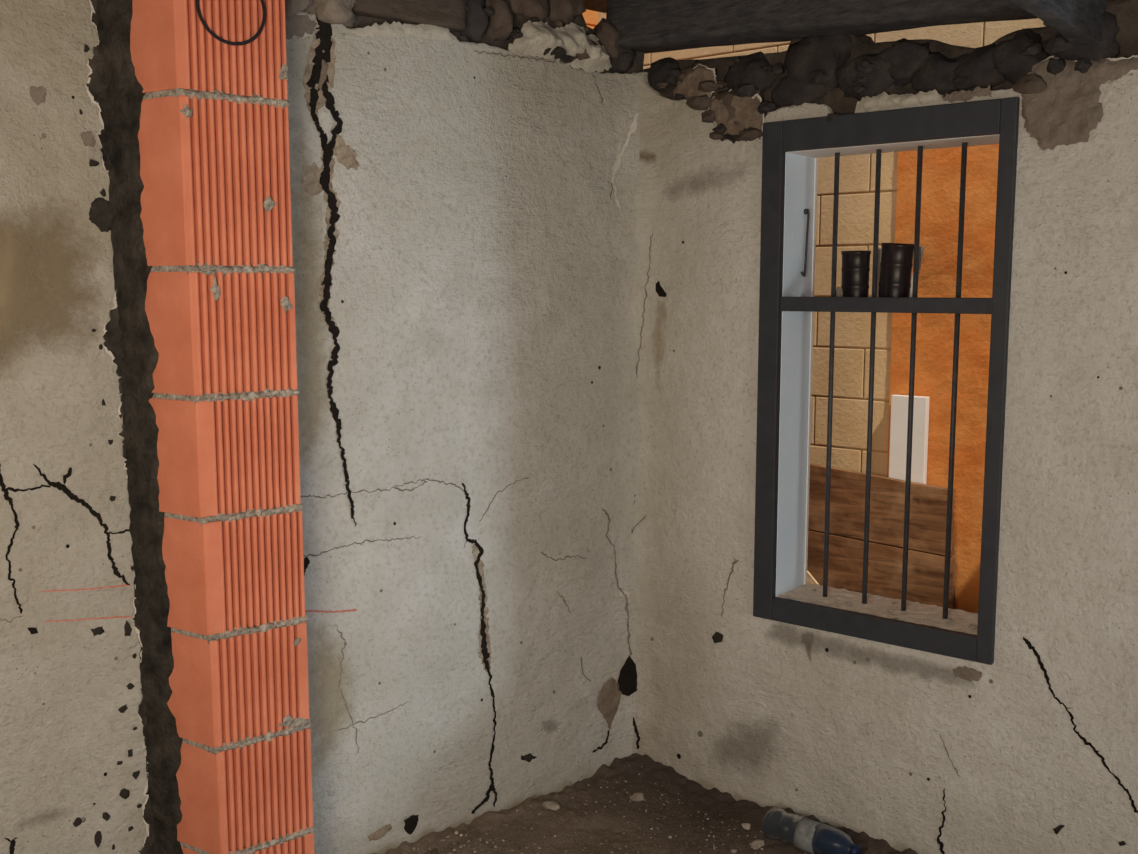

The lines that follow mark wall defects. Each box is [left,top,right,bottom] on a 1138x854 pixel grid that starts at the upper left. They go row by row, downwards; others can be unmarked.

flaking render [72,0,111,171]
flaking render [543,27,598,64]
flaking render [657,64,776,144]
flaking render [1012,55,1138,151]
leakage [0,224,88,359]
flaking render [91,292,128,479]
crack [300,13,529,814]
crack [0,464,130,623]
flaking render [93,803,115,850]
flaking render [104,680,156,854]
flaking render [597,677,622,729]
crack [1023,637,1138,813]